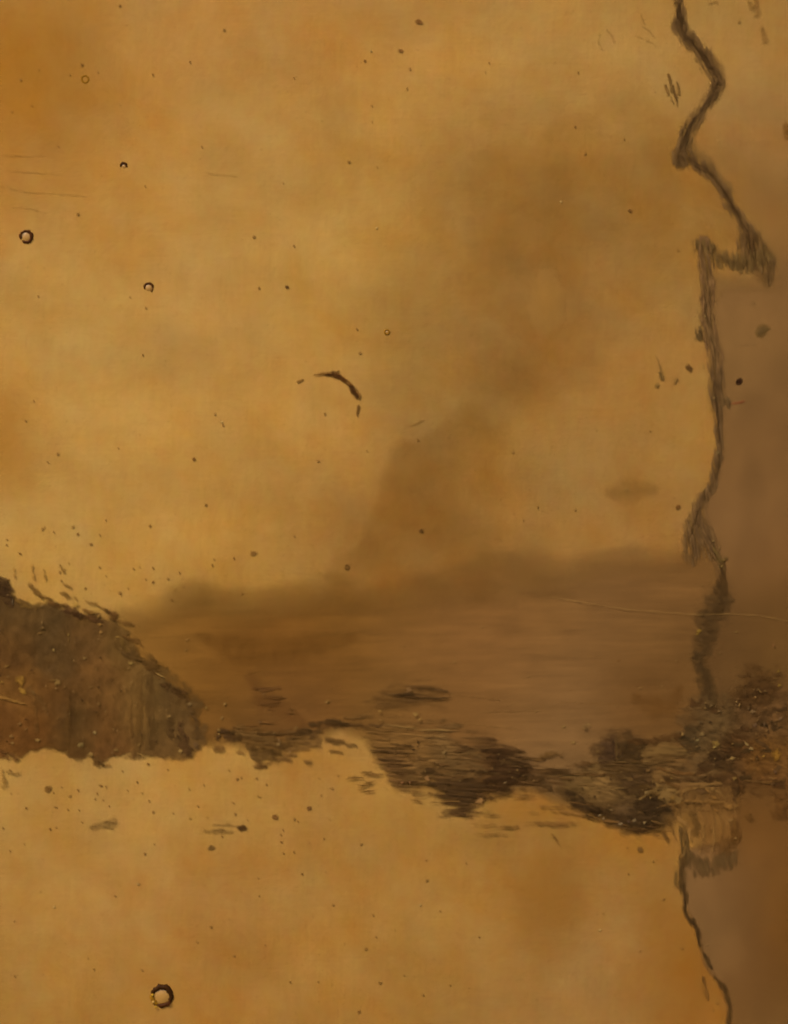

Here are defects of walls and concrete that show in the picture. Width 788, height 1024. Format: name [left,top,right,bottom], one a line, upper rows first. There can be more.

peeling [0,562,220,794]
water stain [124,262,788,1024]
crack [674,826,738,1024]
crack [671,0,776,732]